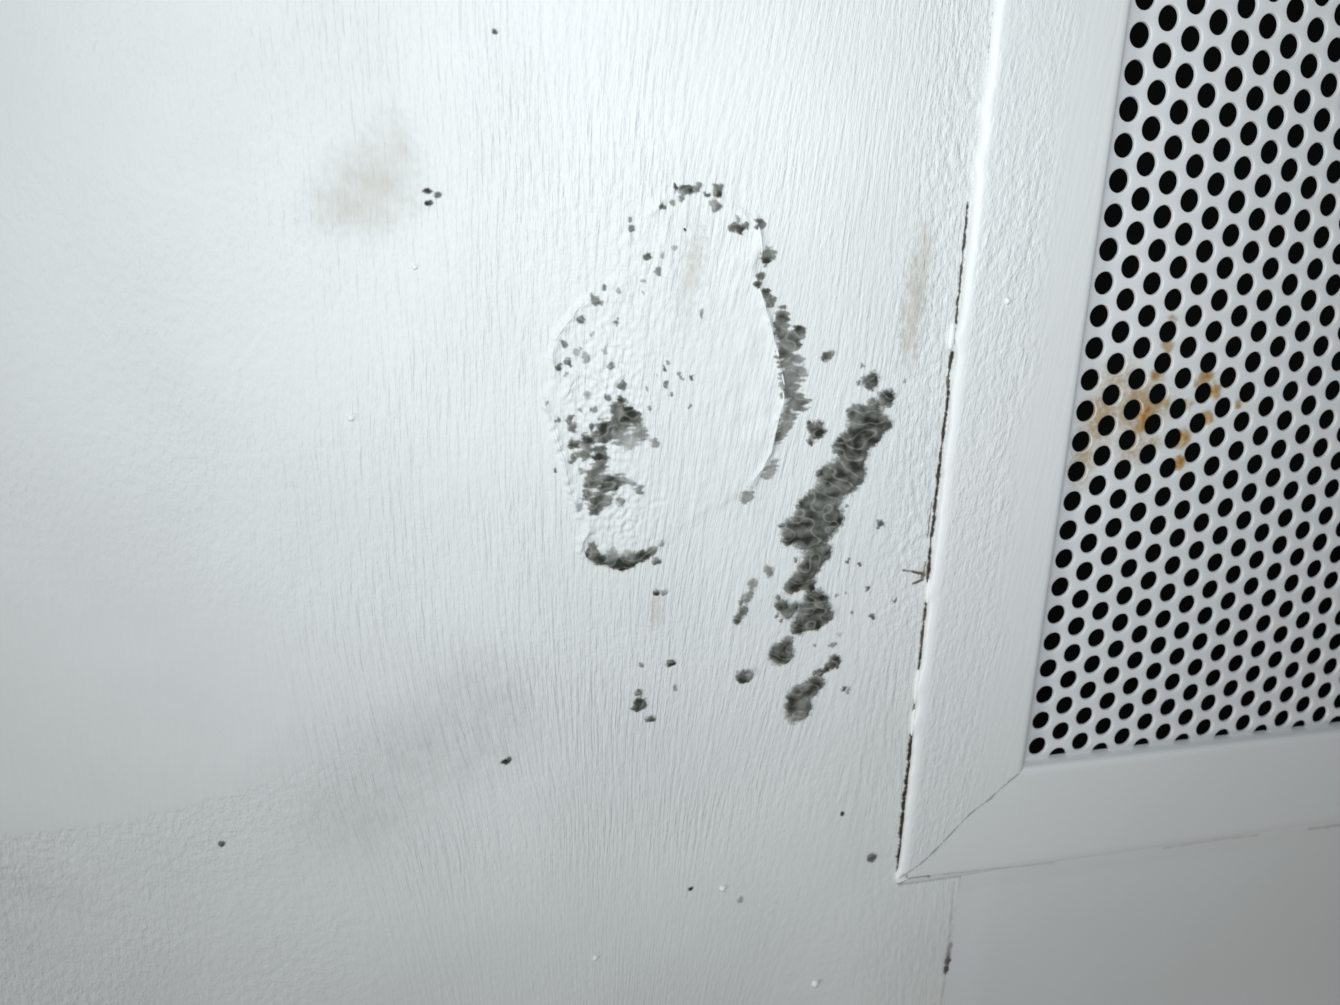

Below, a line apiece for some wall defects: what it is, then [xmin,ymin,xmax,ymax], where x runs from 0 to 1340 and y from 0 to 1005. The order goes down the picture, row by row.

water stain [659,182,723,212]
water stain [728,216,766,235]
rust [1189,371,1221,424]
rust [1079,370,1169,467]
rust [1174,430,1190,470]
water stain [733,248,895,722]
water stain [631,689,656,722]